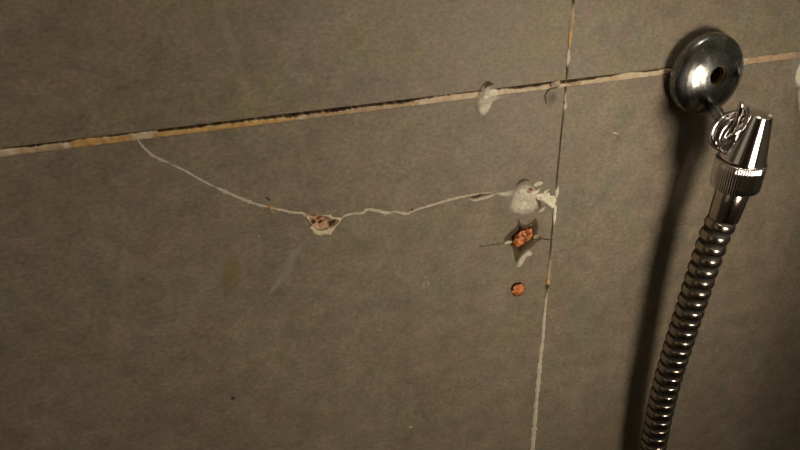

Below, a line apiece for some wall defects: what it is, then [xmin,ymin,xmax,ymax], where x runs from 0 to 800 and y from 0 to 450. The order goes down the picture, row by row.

crack [134,137,312,221]
crack [341,174,503,218]
hole [306,214,342,236]